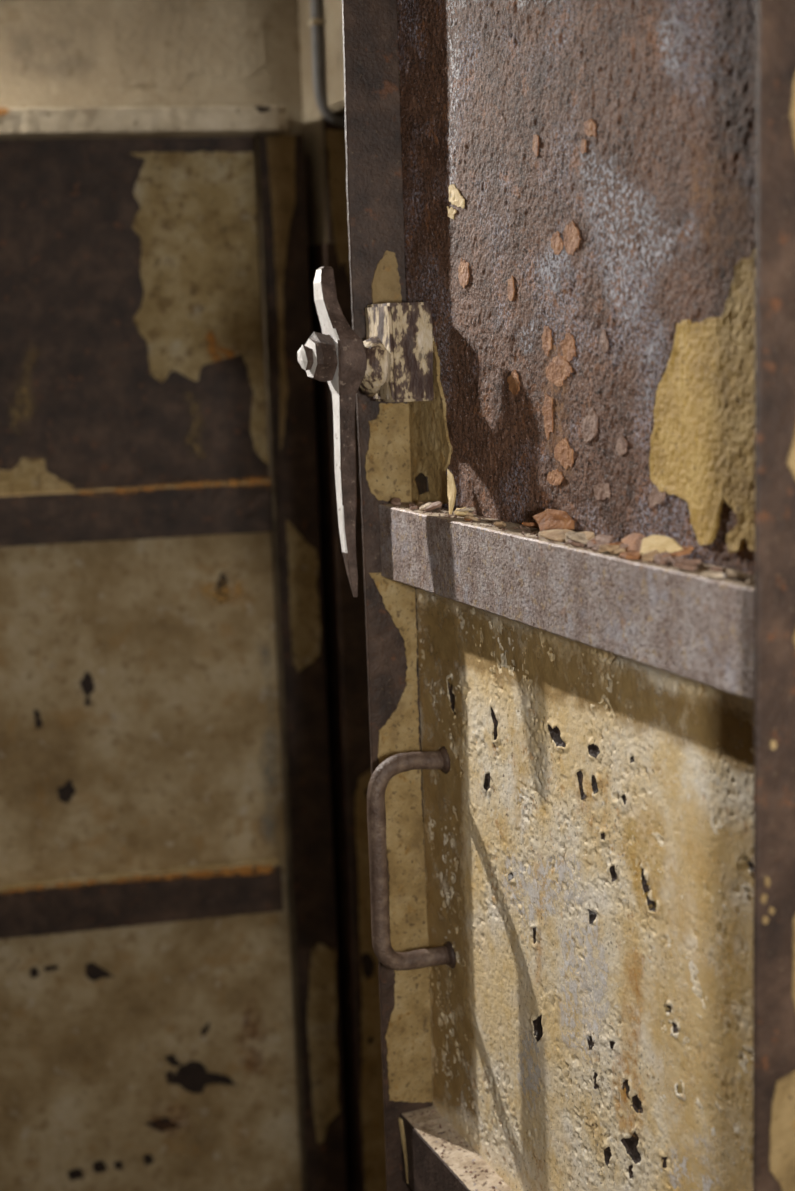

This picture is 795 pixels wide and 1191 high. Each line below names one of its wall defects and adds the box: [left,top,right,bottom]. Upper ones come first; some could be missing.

corrosion [551,221,581,256]
corrosion [458,258,470,289]
peeling [130,134,296,464]
corrosion [542,325,598,486]
corrosion [593,483,611,500]
corrosion [533,508,575,542]
corrosion [621,532,646,552]
spalling [548,724,566,747]
spalling [577,771,599,800]
spalling [164,1054,237,1093]
spalling [622,1079,643,1113]
spalling [604,1131,641,1179]